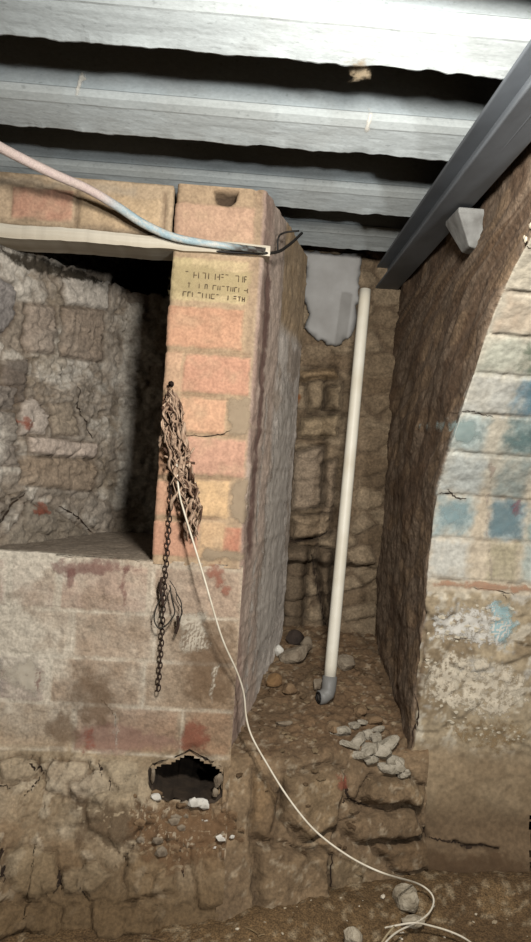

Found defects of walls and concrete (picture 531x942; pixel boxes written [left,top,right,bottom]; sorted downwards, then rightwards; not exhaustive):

damp [438,580,531,593]
crack [0,756,44,796]
spalling [128,749,245,875]
crack [423,827,499,849]
crack [0,848,8,888]
crack [54,868,86,896]